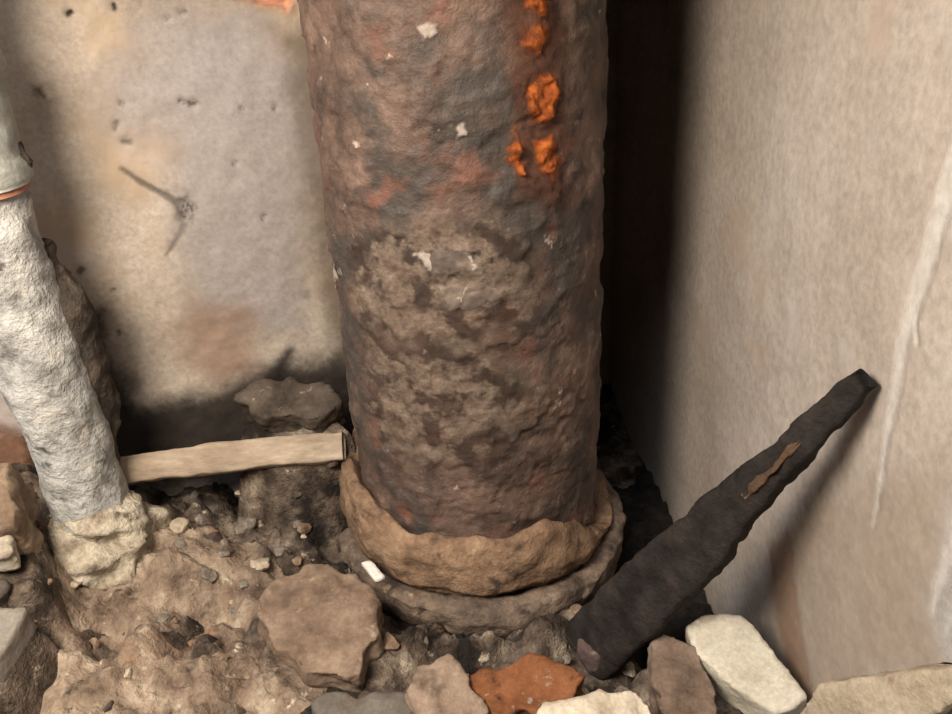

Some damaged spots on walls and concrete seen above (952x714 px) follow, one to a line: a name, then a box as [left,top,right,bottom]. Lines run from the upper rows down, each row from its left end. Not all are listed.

flaking render [256,0,293,11]
rust [507,0,565,198]
crack [121,168,193,249]